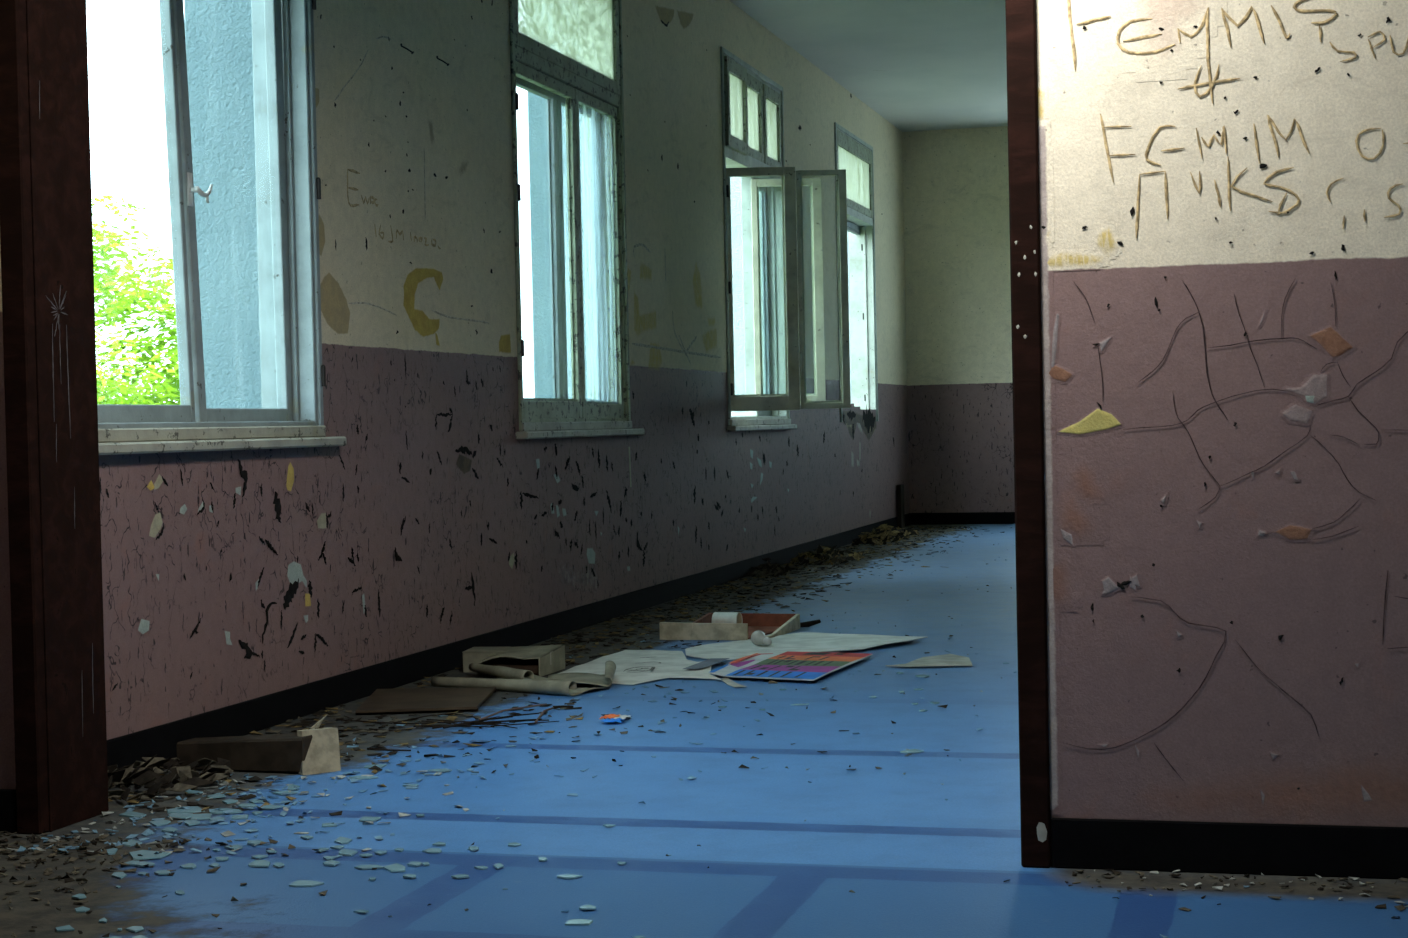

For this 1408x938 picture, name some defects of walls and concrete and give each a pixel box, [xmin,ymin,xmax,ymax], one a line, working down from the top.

peeling [137,617,151,637]
peeling [145,470,219,540]
peeling [223,459,331,670]
peeling [435,329,513,432]
peeling [394,425,652,608]
peeling [672,431,799,551]
spalling [839,403,894,448]
spalling [1015,120,1124,842]
crack [1073,281,1103,391]
crack [1123,279,1408,540]
crack [1382,572,1408,649]
crack [1062,596,1319,781]